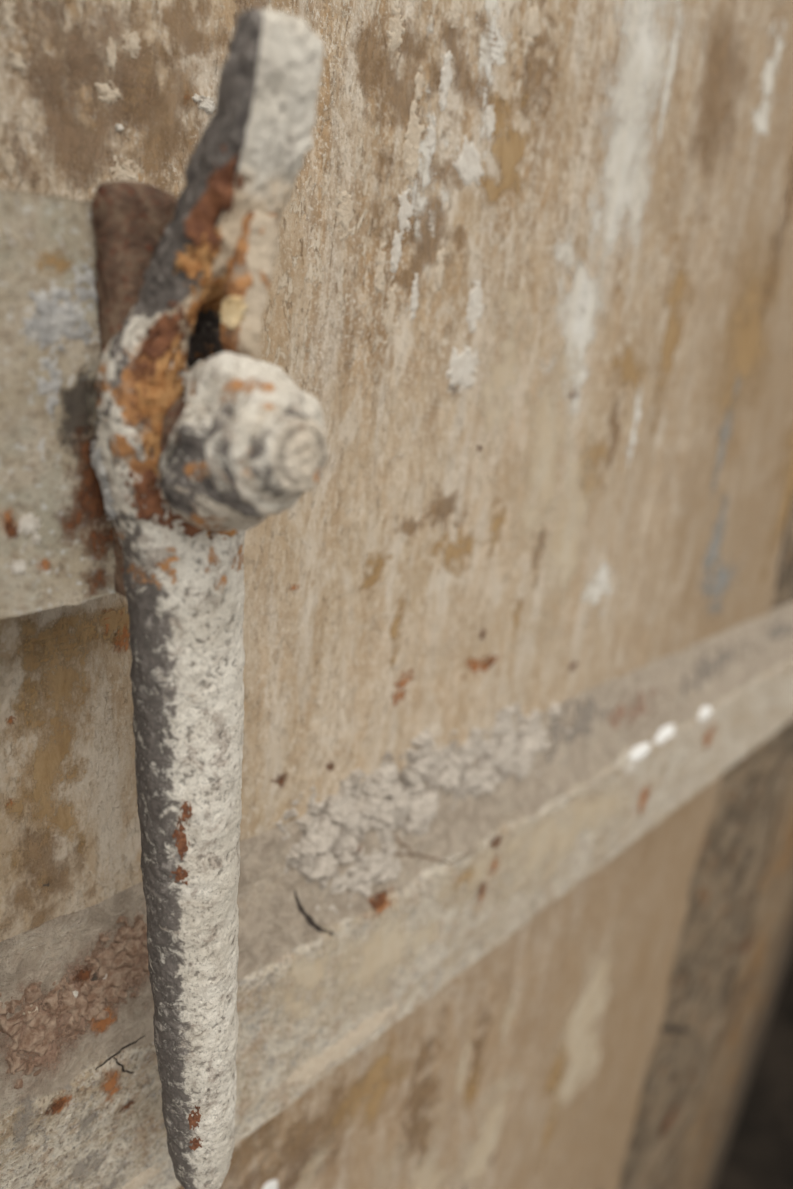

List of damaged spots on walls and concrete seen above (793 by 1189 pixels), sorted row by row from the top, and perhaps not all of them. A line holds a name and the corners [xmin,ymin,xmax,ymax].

spalling [273,701,572,914]
corrosion [170,799,192,885]
corrosion [73,969,99,986]
corrosion [45,1095,72,1115]
corrosion [188,1105,203,1151]